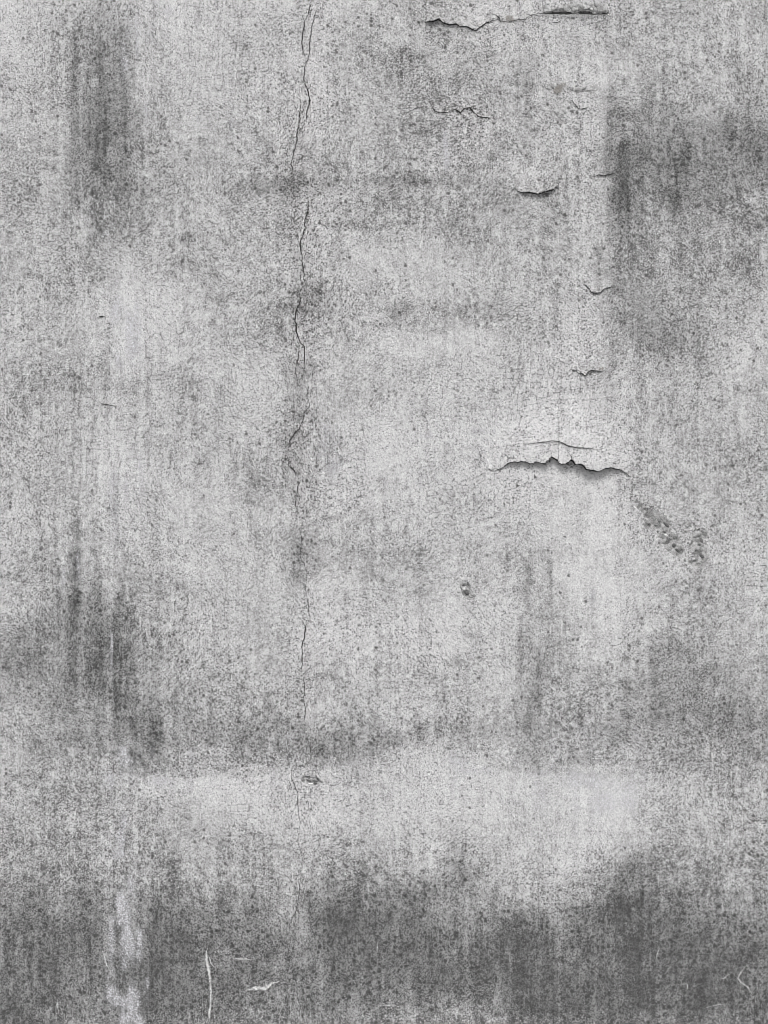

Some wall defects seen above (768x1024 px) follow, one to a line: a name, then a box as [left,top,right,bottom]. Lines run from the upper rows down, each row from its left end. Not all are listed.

flaking render [407,0,608,31]
damp [65,11,158,228]
flaking render [515,157,559,194]
damp [602,95,768,241]
damp [611,272,701,354]
flaking render [480,395,630,476]
crack [287,4,320,1020]
damp [0,847,768,1024]